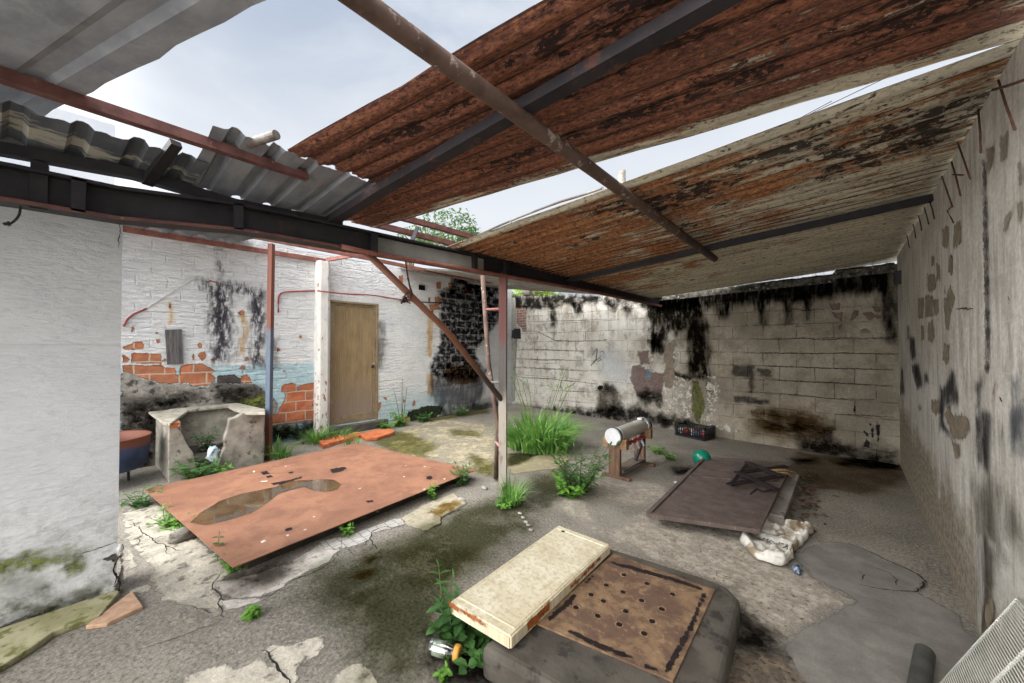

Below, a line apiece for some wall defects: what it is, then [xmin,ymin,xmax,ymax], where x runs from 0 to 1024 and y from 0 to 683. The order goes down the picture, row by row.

leakage [208,282,264,366]
leakage [459,279,499,338]
leakage [512,262,898,399]
flaking render [120,327,314,435]
peeling [630,340,738,432]
leakage [756,410,898,469]
spalling [931,400,969,459]
leakage [976,412,989,467]
crack [81,504,194,592]
crack [139,572,238,650]
leakage [976,533,1007,636]
crack [261,648,291,683]